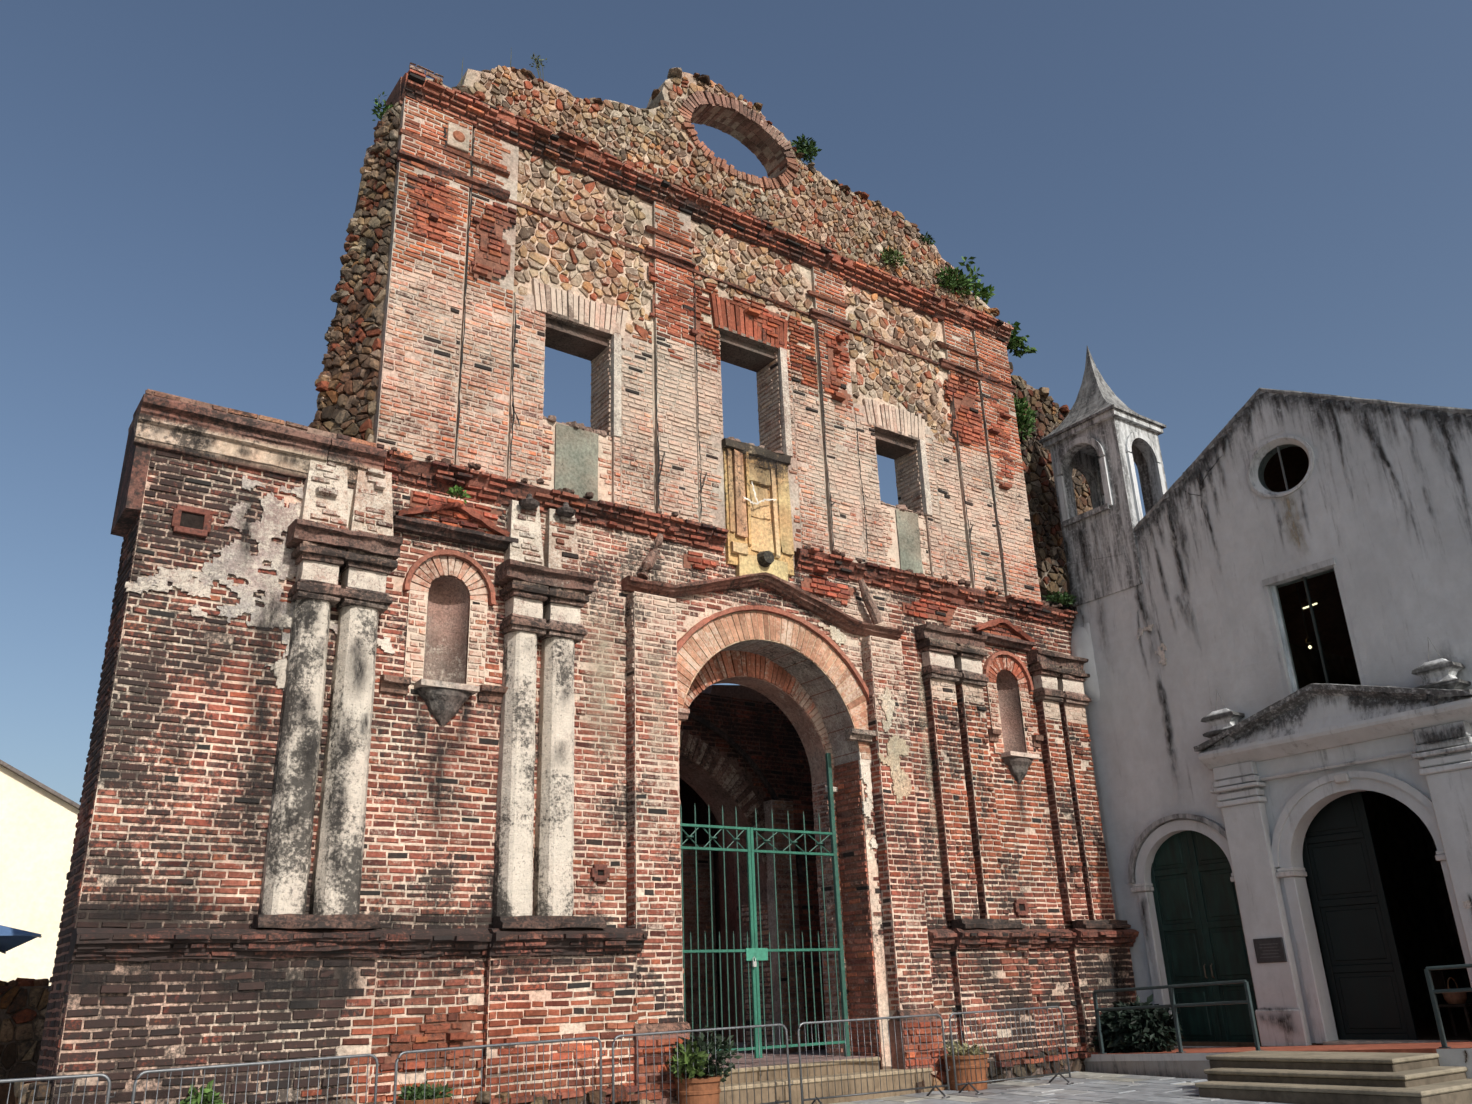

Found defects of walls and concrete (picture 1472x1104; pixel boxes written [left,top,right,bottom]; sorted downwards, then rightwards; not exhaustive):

leakage [243,498,254,550]
leakage [1141,395,1288,614]
leakage [1316,401,1466,507]
peeling [124,476,303,691]
leakage [251,598,280,743]
peeling [377,637,395,654]
peeling [817,622,847,646]
peeling [854,680,912,819]
leakage [1158,682,1172,754]
leakage [1420,725,1467,744]